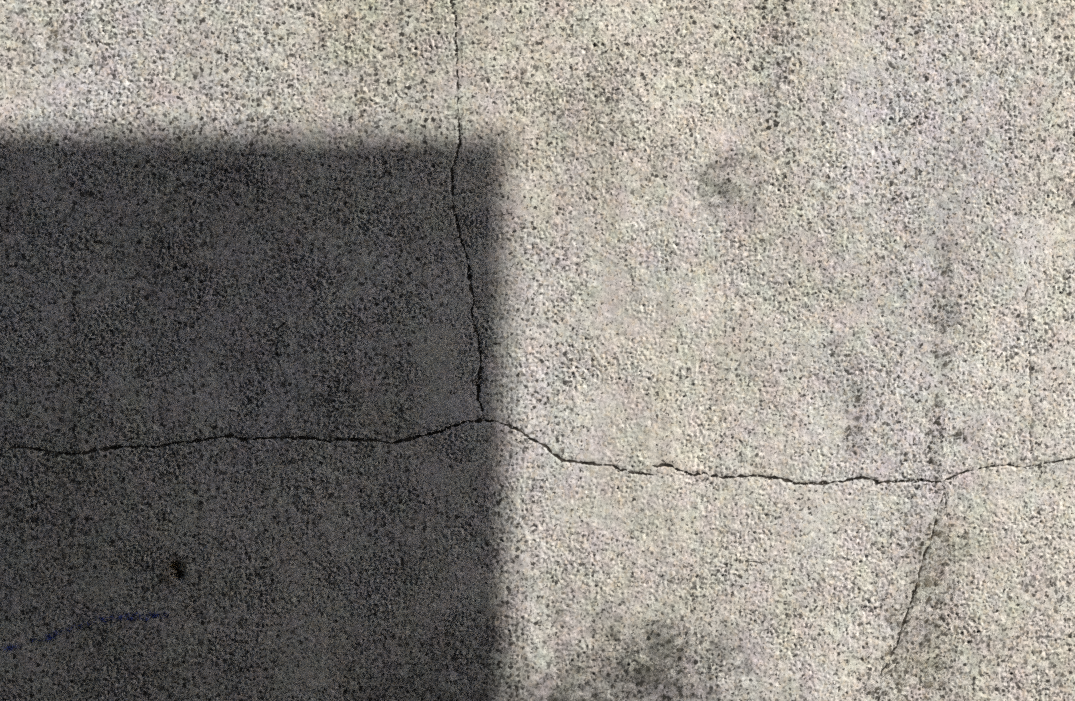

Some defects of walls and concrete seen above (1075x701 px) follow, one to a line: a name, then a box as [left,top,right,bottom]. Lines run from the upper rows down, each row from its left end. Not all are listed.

crack [0,0,1075,505]
crack [881,513,948,674]